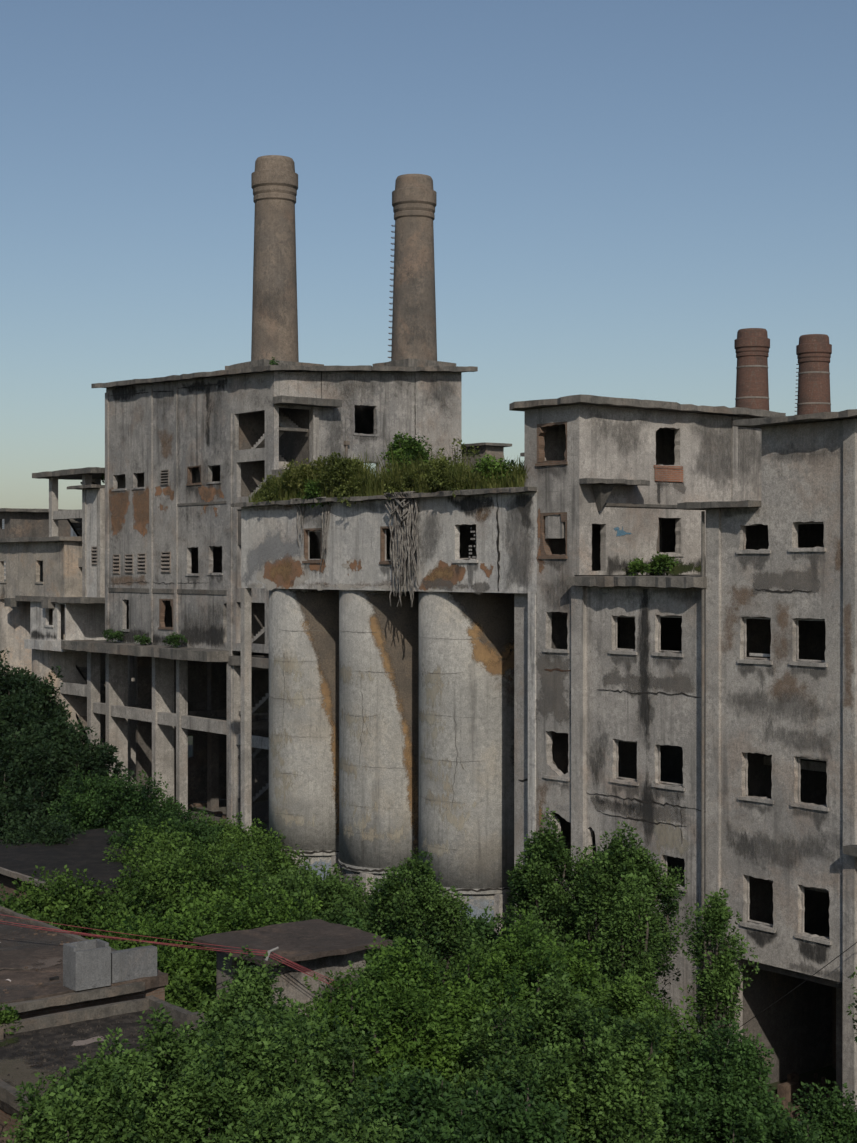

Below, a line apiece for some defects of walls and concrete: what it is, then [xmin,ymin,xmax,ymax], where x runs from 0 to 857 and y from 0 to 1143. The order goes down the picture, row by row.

flaking render [109,486,174,537]
flaking render [248,554,493,594]
rust [468,622,514,702]
damp [633,589,649,741]
rust [318,666,339,835]
rust [370,614,419,851]
damp [642,781,653,842]